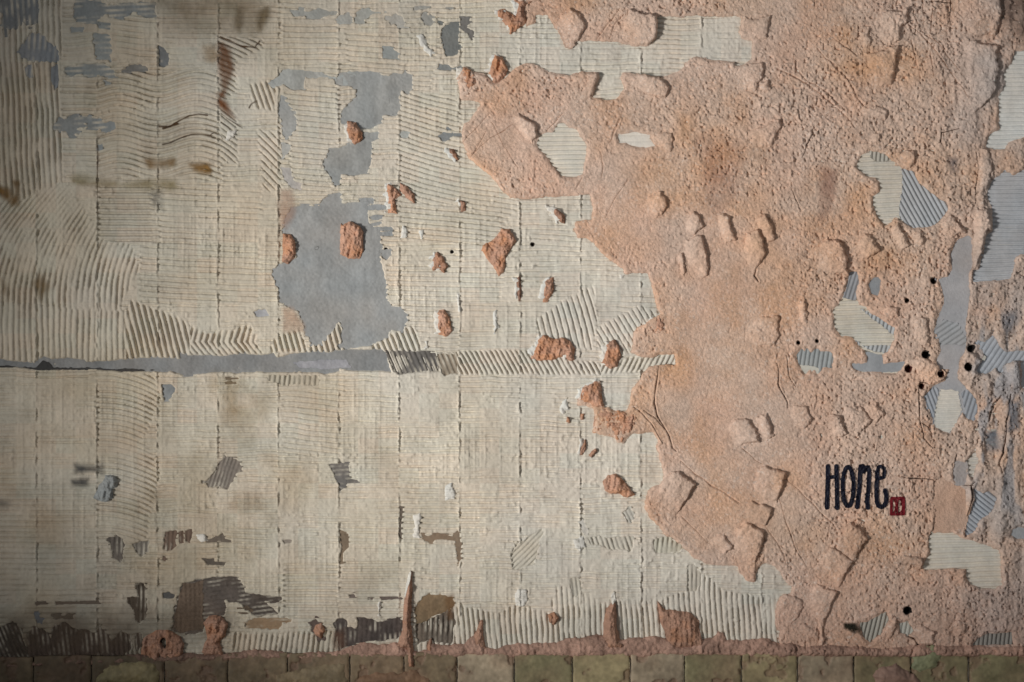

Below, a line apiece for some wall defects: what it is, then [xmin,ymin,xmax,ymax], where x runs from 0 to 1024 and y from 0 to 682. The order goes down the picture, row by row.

peeling [0,0,169,89]
peeling [290,5,474,71]
spalling [986,50,1024,149]
peeling [0,46,458,402]
spalling [856,151,948,228]
spalling [833,271,905,374]
spalling [924,170,1024,433]
peeling [202,456,243,489]
peeling [329,462,360,493]
peeling [162,529,193,561]
peeling [421,531,462,566]
peeling [163,576,292,635]